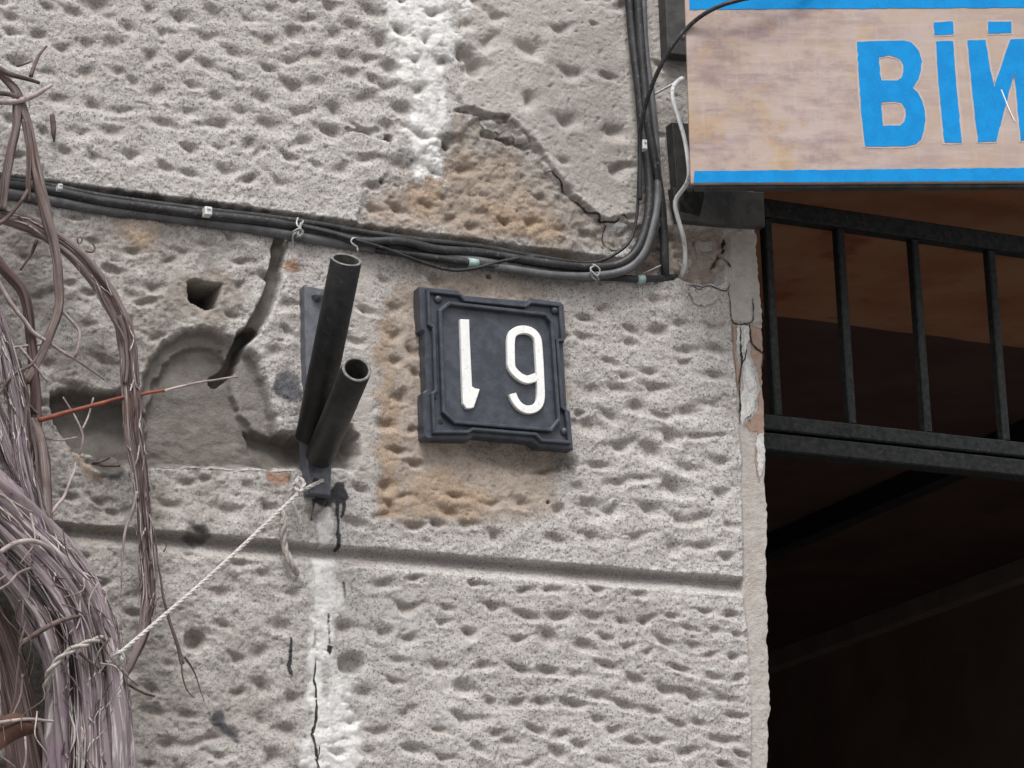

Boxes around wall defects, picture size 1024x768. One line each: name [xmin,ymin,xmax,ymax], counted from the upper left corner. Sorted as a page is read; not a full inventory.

leakage [380,0,474,196]
spalling [397,112,620,260]
crack [553,172,632,251]
spalling [169,268,243,322]
crack [690,239,764,418]
flaking render [732,323,765,481]
leakage [296,498,365,768]
crack [311,662,320,768]